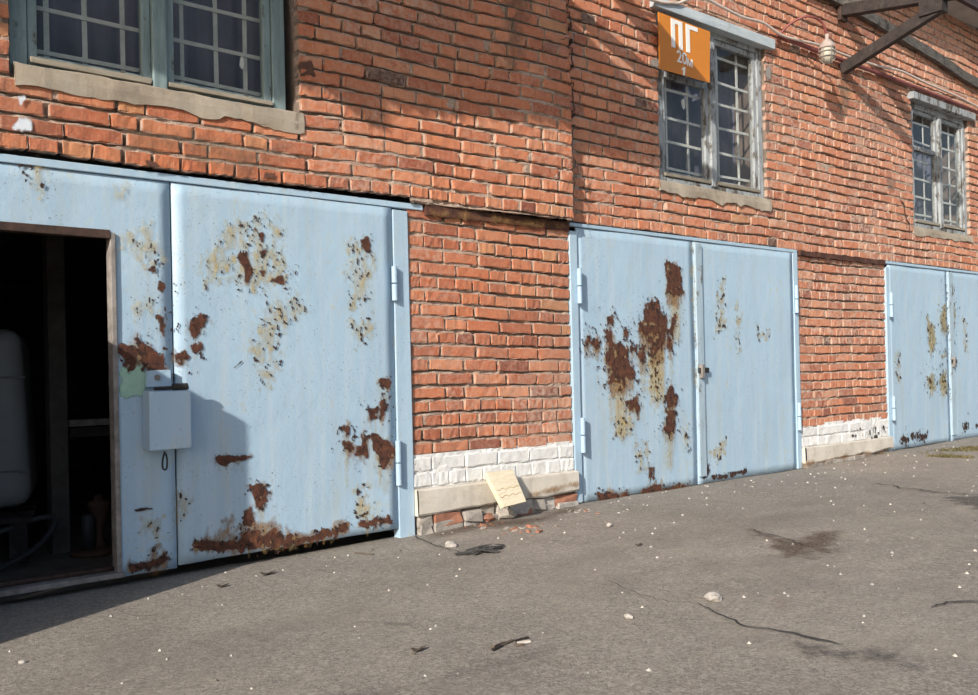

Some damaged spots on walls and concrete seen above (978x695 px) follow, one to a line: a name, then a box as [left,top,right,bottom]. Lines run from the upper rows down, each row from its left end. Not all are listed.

peeling [201,212,287,294]
rust [118,260,215,379]
peeling [248,297,306,385]
rust [579,259,685,445]
rust [921,271,960,406]
rust [189,472,393,556]
rust [331,376,397,476]
rust [594,487,629,501]
rust [642,467,690,494]
rust [703,465,747,481]
rust [899,428,928,447]
rust [128,544,171,574]